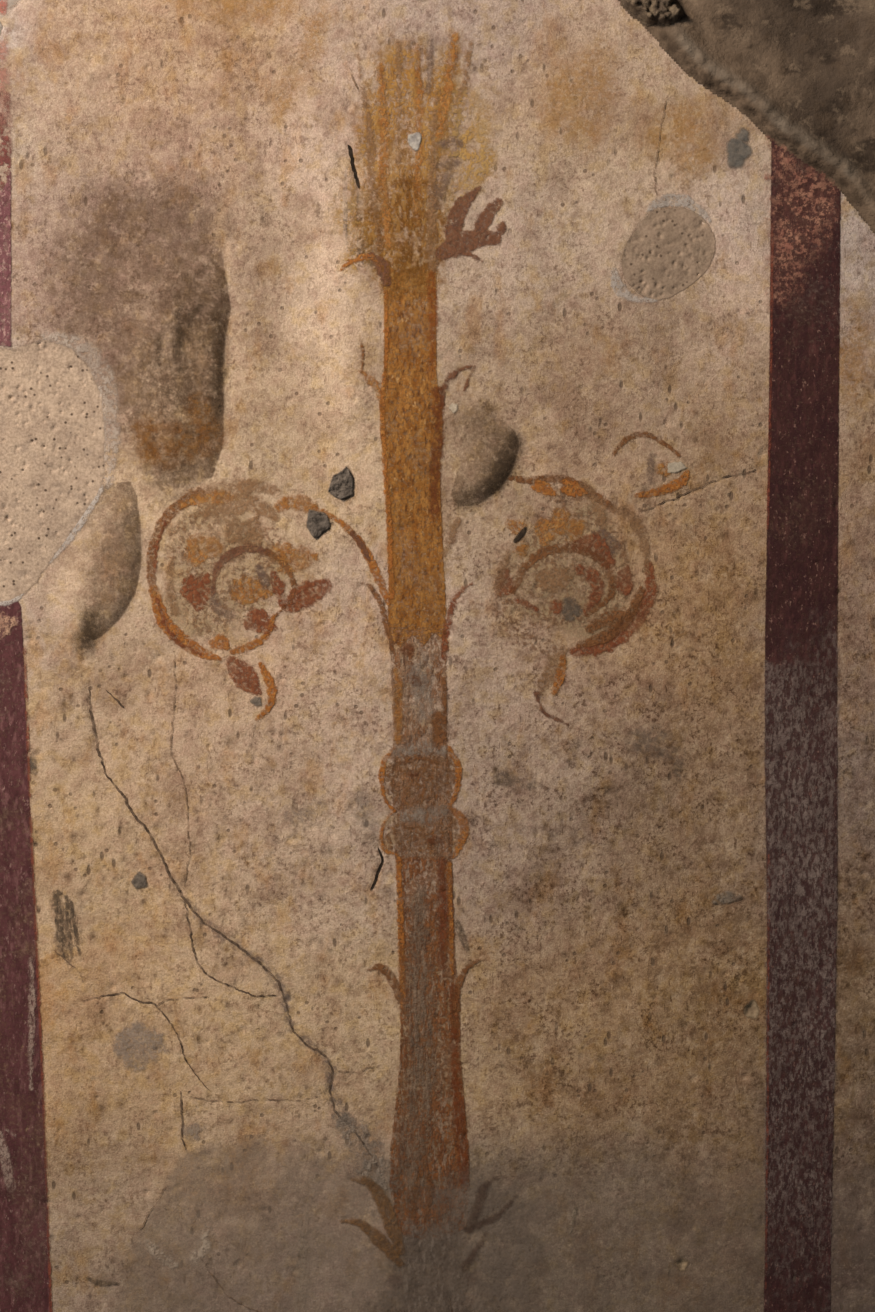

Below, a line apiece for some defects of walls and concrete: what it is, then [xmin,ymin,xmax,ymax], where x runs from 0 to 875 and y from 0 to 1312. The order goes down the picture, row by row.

flaking render [622,0,685,27]
spalling [727,129,751,167]
peeling [764,145,836,303]
leakage [215,317,225,408]
crack [53,651,377,1167]